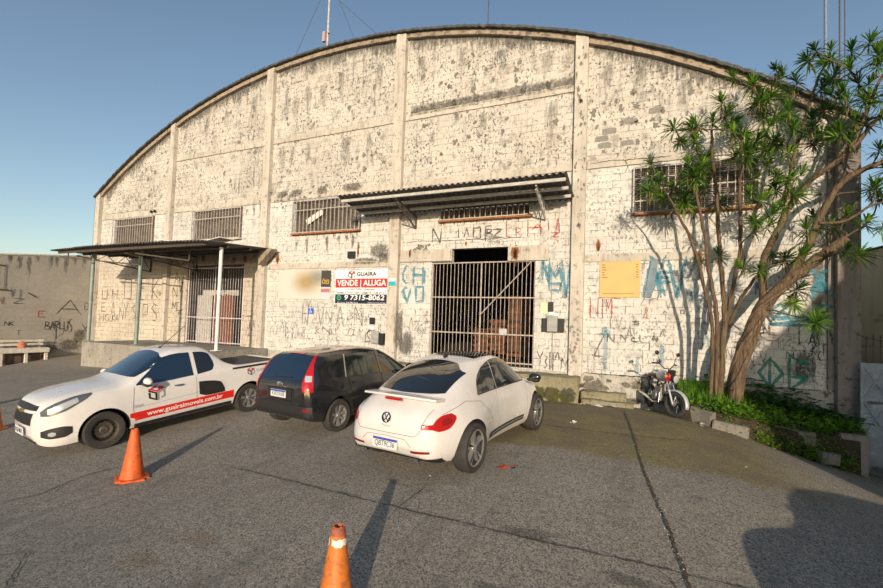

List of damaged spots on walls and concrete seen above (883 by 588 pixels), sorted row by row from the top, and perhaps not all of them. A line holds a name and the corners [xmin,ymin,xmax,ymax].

damp [411,73,577,115]
crack [0,552,27,588]